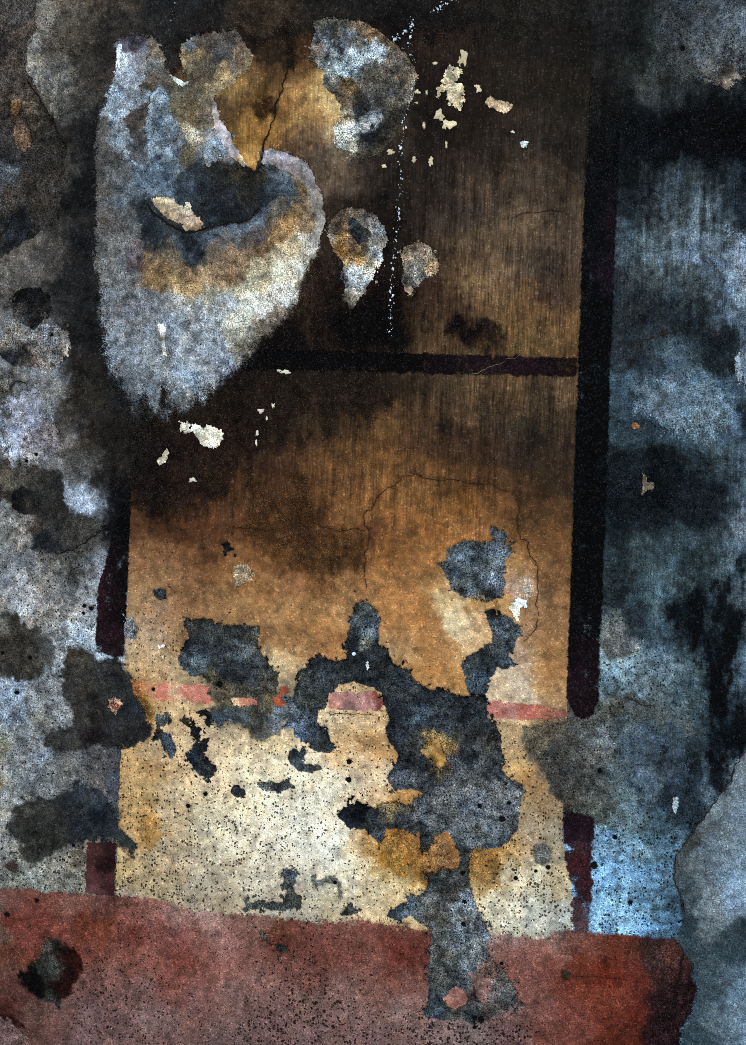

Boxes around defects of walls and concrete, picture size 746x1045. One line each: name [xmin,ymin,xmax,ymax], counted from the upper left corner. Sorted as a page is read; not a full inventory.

spalling [93,27,388,449]
crack [258,69,288,172]
damp [352,19,416,336]
spalling [304,17,513,168]
spalling [398,240,440,297]
efflorescence [0,384,62,469]
spalling [0,453,108,556]
crack [311,474,539,643]
damp [603,444,737,548]
damp [631,316,746,444]
damp [612,551,746,825]
spalling [0,526,527,1029]